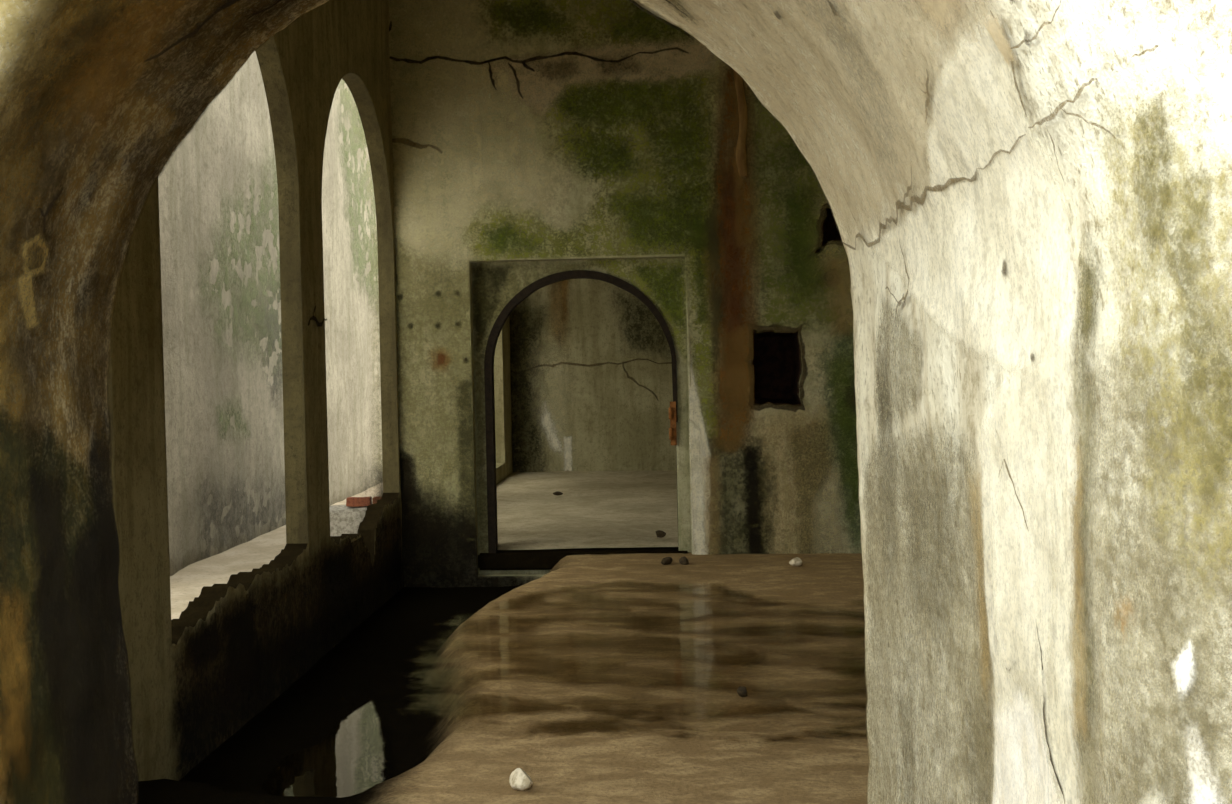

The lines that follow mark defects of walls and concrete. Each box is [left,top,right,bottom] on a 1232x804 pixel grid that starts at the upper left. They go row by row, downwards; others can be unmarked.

crack [389,0,692,99]
leakage [0,0,327,804]
leakage [689,367,773,555]
rust [707,64,757,448]
spalling [747,324,808,412]
leakage [790,340,859,554]
spalling [807,203,844,257]
crack [843,1,1116,323]
leakage [1077,255,1092,341]
leakage [1136,101,1232,493]